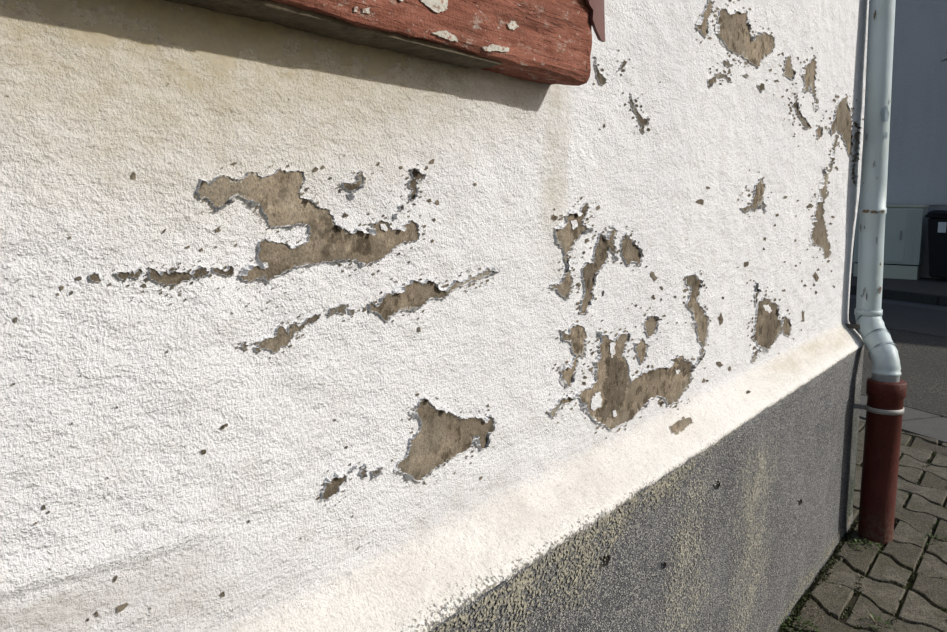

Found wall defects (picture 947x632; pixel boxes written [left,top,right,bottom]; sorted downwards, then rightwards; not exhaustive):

peeling [695,0,864,186]
peeling [75,159,439,307]
peeling [737,169,779,226]
peeling [236,267,500,359]
peeling [546,197,731,439]
peeling [746,280,805,363]
peeling [313,393,497,509]